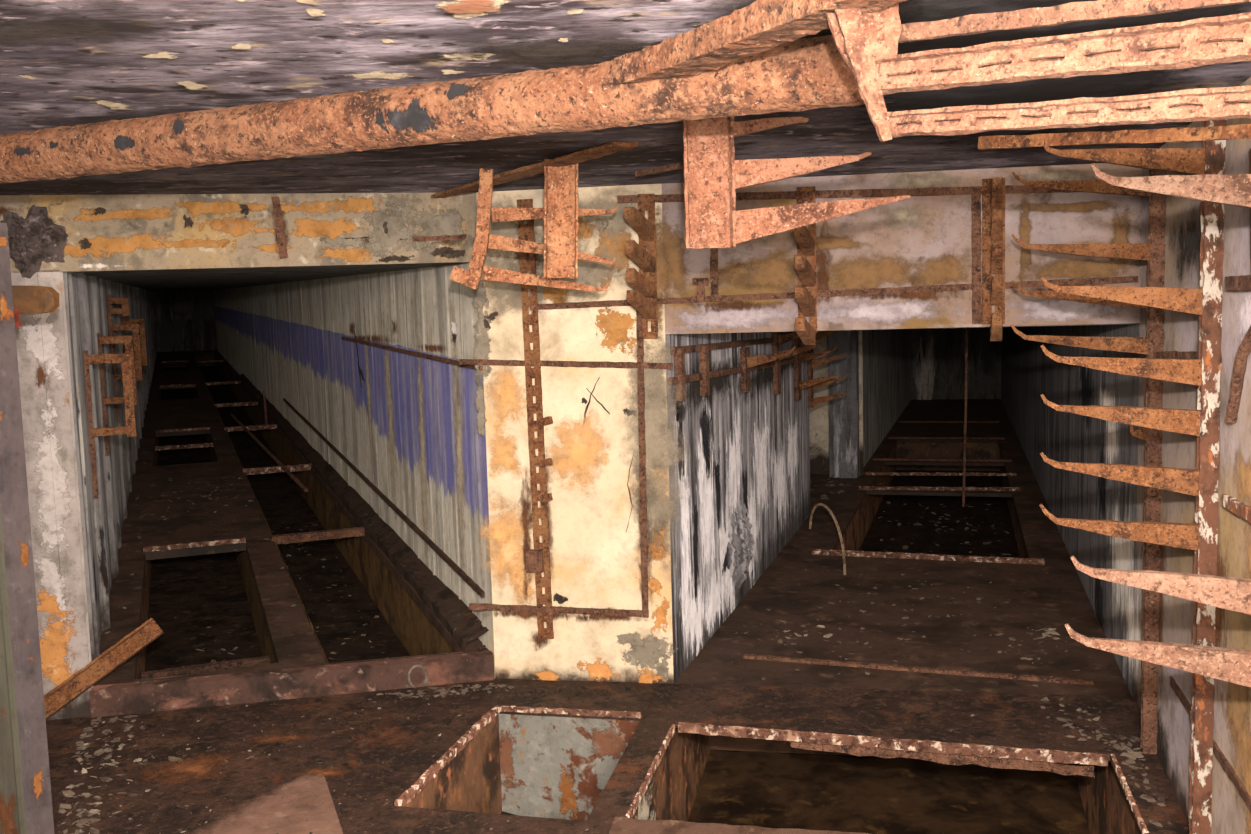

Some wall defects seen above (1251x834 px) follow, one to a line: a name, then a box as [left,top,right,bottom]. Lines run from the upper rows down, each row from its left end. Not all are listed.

rust [444,83,470,100]
rust [375,97,444,135]
rust [114,135,135,150]
peeling [59,197,474,263]
rust [706,301,768,311]
rust [868,292,937,300]
water stain [631,346,794,553]
peeling [21,313,97,686]
rust [521,472,532,595]
rust [552,608,630,621]
rust [1215,607,1225,647]
rust [558,764,579,820]